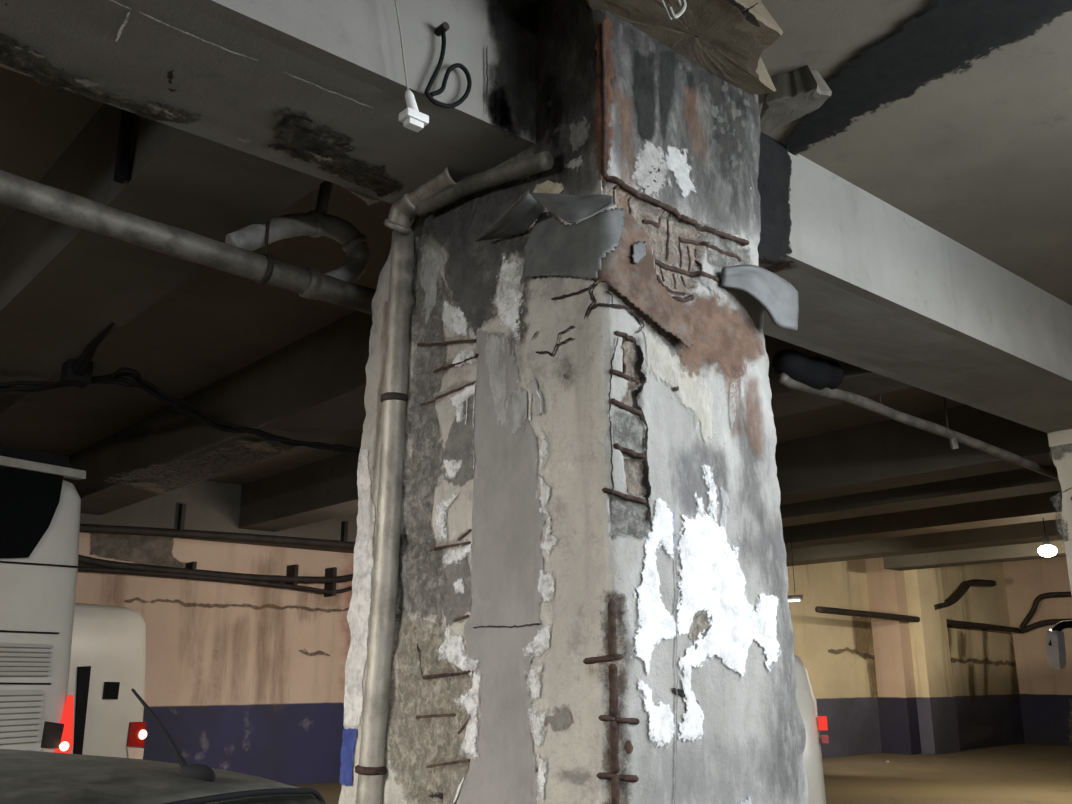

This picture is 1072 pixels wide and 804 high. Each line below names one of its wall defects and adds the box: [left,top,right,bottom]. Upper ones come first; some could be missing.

damp [488,88,515,135]
crack [531,281,645,356]
corrosion [674,294,765,428]
crack [124,598,349,613]
spalling [385,246,479,804]
peeling [583,331,781,804]